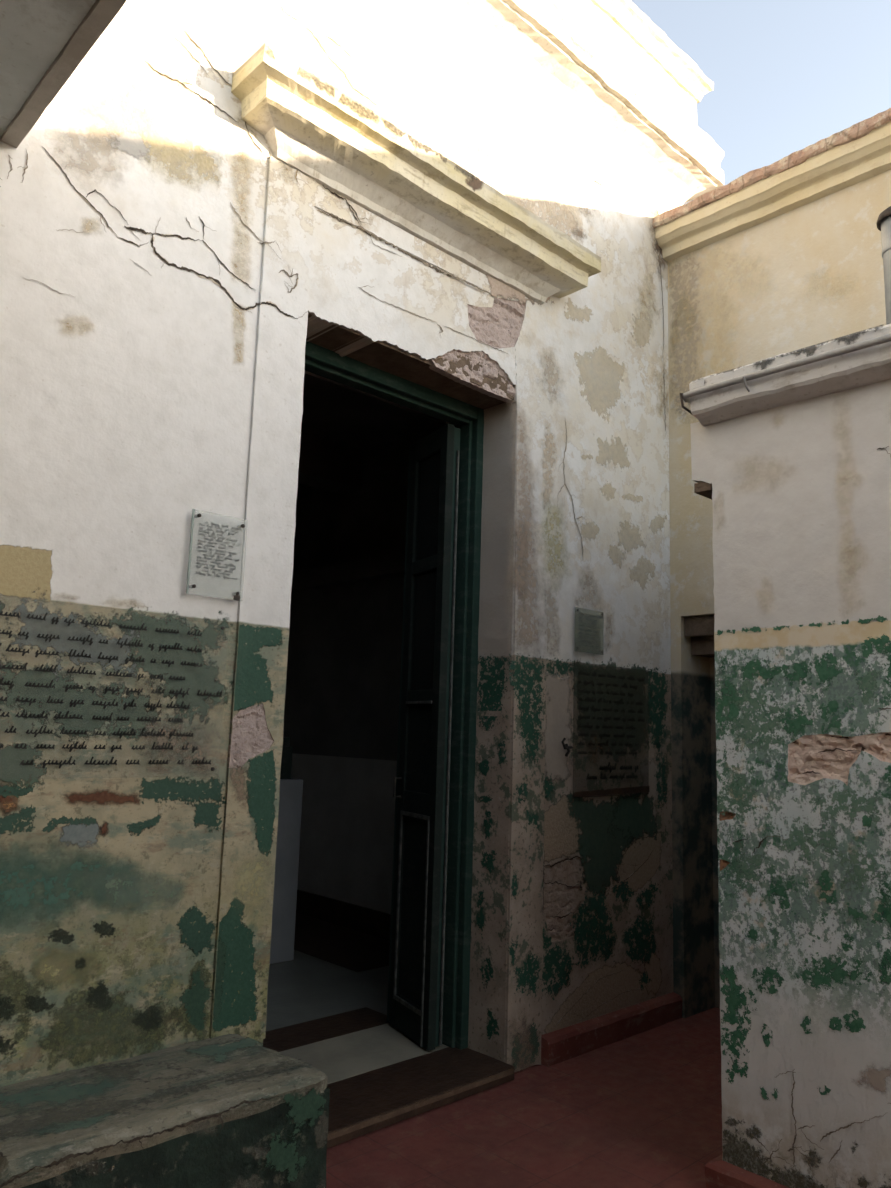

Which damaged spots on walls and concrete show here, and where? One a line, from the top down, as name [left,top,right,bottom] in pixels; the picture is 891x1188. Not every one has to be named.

crack [279,0,379,109]
crack [0,147,308,319]
crack [145,31,491,294]
spalling [429,274,549,404]
crack [557,421,586,555]
peeling [0,545,285,1035]
peeling [476,653,669,1000]
peeling [716,615,891,1084]
peeling [232,1088,329,1188]
crack [751,1070,891,1183]